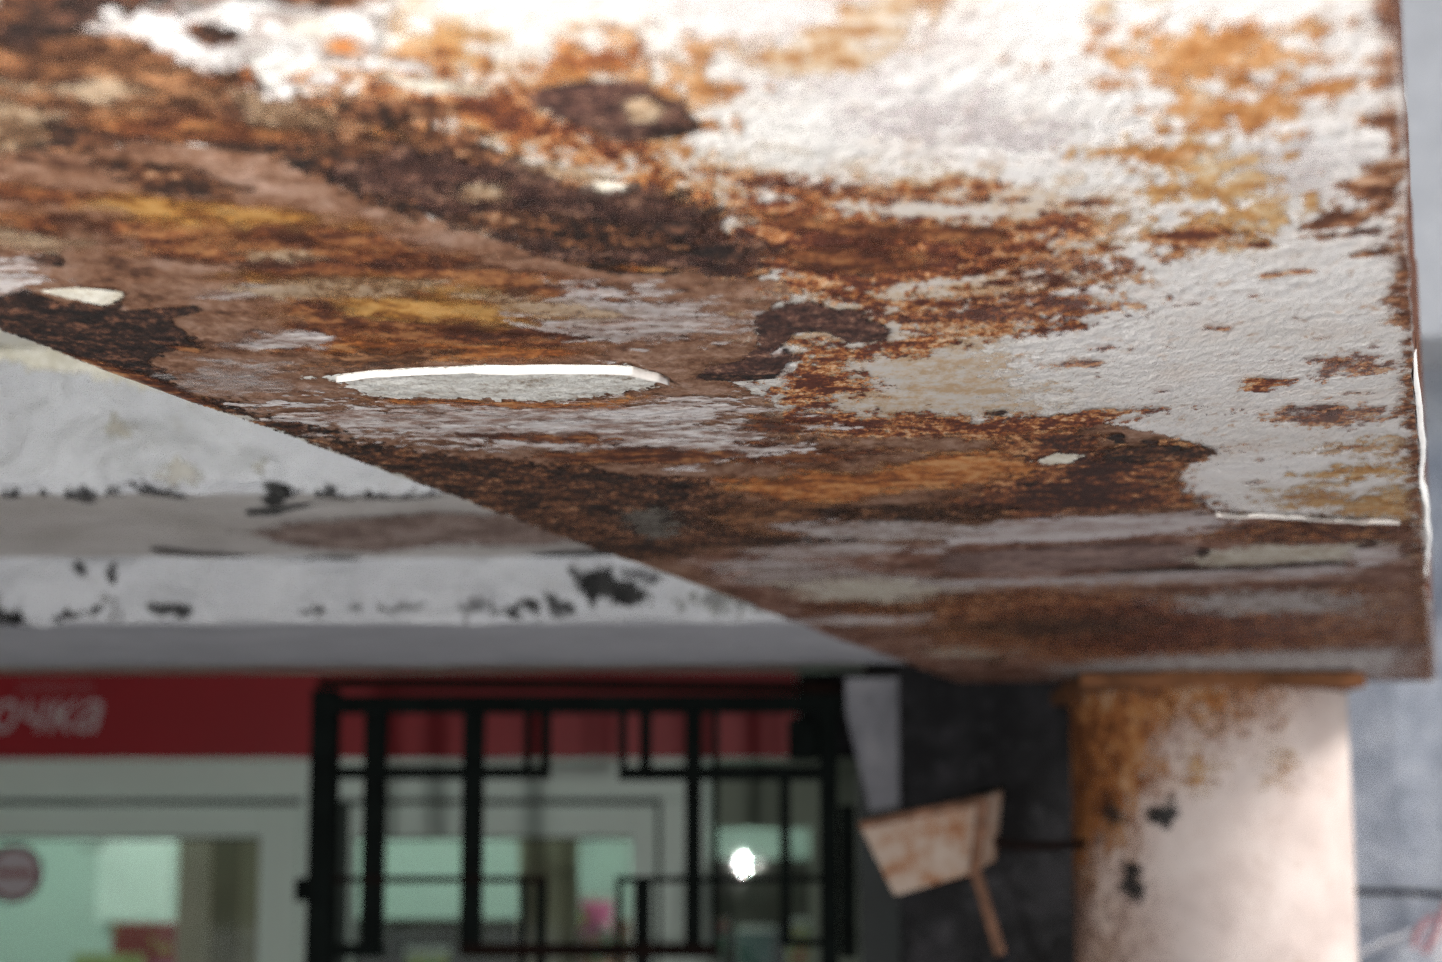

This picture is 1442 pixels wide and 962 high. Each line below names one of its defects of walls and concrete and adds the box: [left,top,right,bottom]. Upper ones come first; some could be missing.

corrosion [0,0,1433,683]
peeling [0,140,1433,682]
corrosion [1070,687,1302,911]